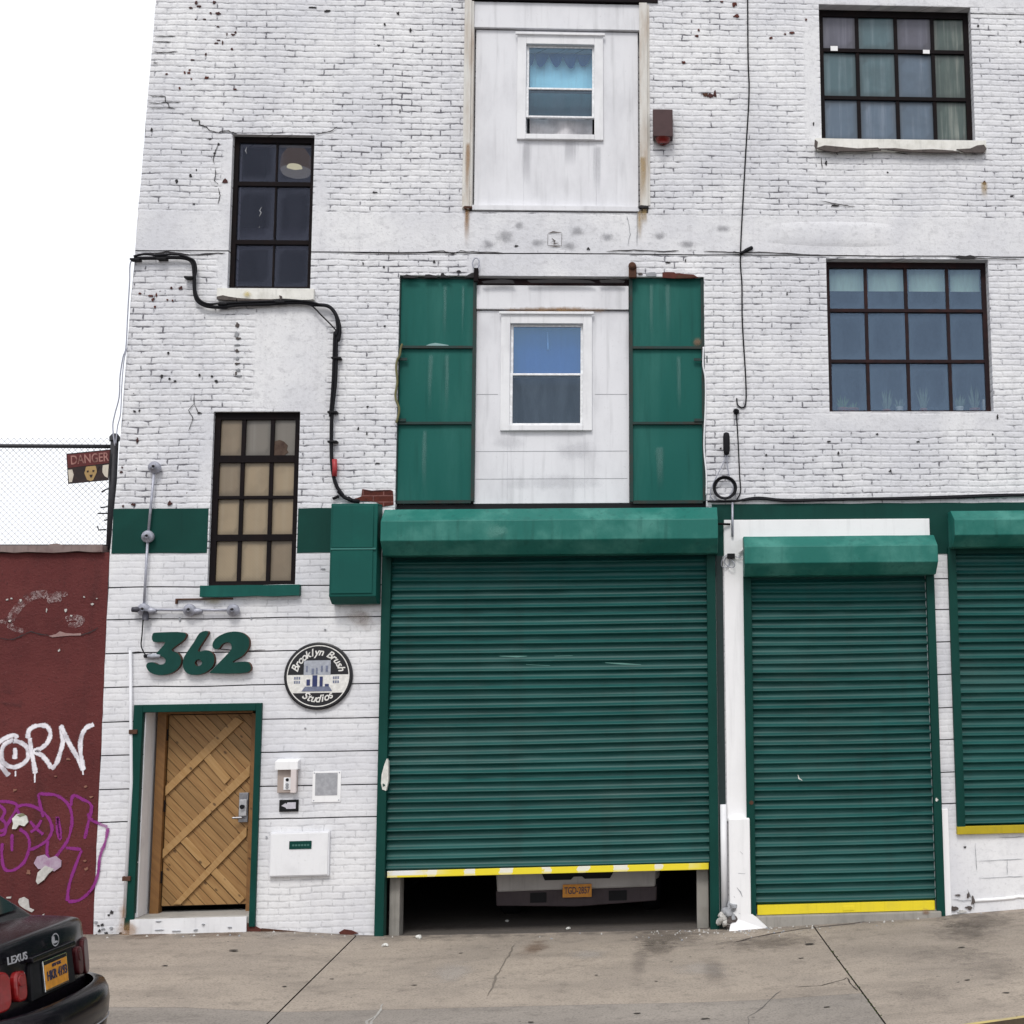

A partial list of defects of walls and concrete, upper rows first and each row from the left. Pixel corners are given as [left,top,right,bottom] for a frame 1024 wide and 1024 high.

crack [148,95,237,203]
flaking render [355,489,394,507]
spalling [951,893,975,913]
crack [487,945,514,996]